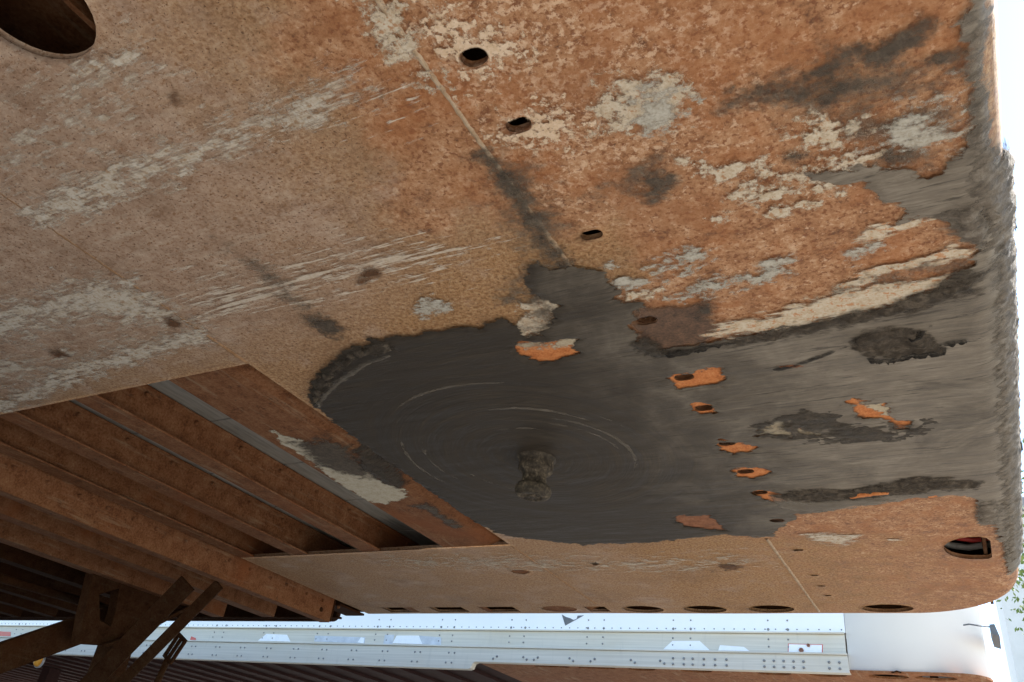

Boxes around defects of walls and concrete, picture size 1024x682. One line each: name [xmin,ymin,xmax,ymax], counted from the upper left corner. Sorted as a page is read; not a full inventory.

water stain [71,49,141,88]
water stain [717,46,918,115]
water stain [368,83,420,132]
peeling [627,80,707,138]
water stain [358,269,381,285]
peeling [756,255,799,274]
rust [515,339,578,362]
rust [667,367,725,389]
rust [845,398,911,430]
water stain [288,438,374,479]
rust [676,515,725,530]